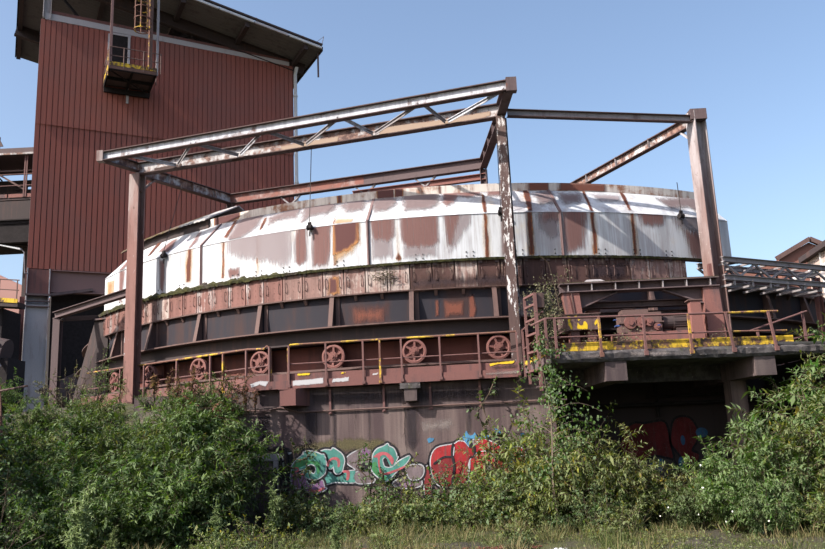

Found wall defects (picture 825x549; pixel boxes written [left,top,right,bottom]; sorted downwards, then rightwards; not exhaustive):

rust [332,216,359,265]
rust [523,183,549,256]
rust [560,183,605,254]
rust [620,192,638,255]
rust [353,308,383,324]
rust [435,295,476,317]
water stain [293,386,500,454]